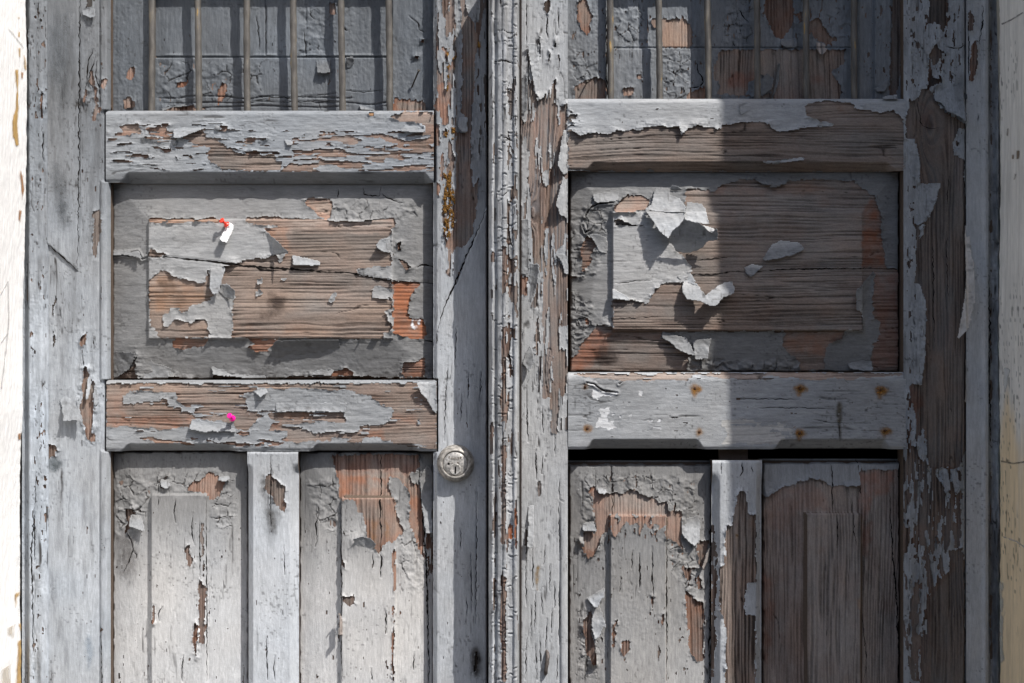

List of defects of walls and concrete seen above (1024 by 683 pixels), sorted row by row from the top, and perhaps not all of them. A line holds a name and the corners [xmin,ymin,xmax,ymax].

peeling [540,0,555,19]
peeling [926,0,948,36]
peeling [953,130,966,158]
peeling [113,193,431,358]
peeling [570,234,608,282]
peeling [520,505,534,551]
peeling [114,453,296,683]
peeling [568,463,899,683]
peeling [903,445,966,683]